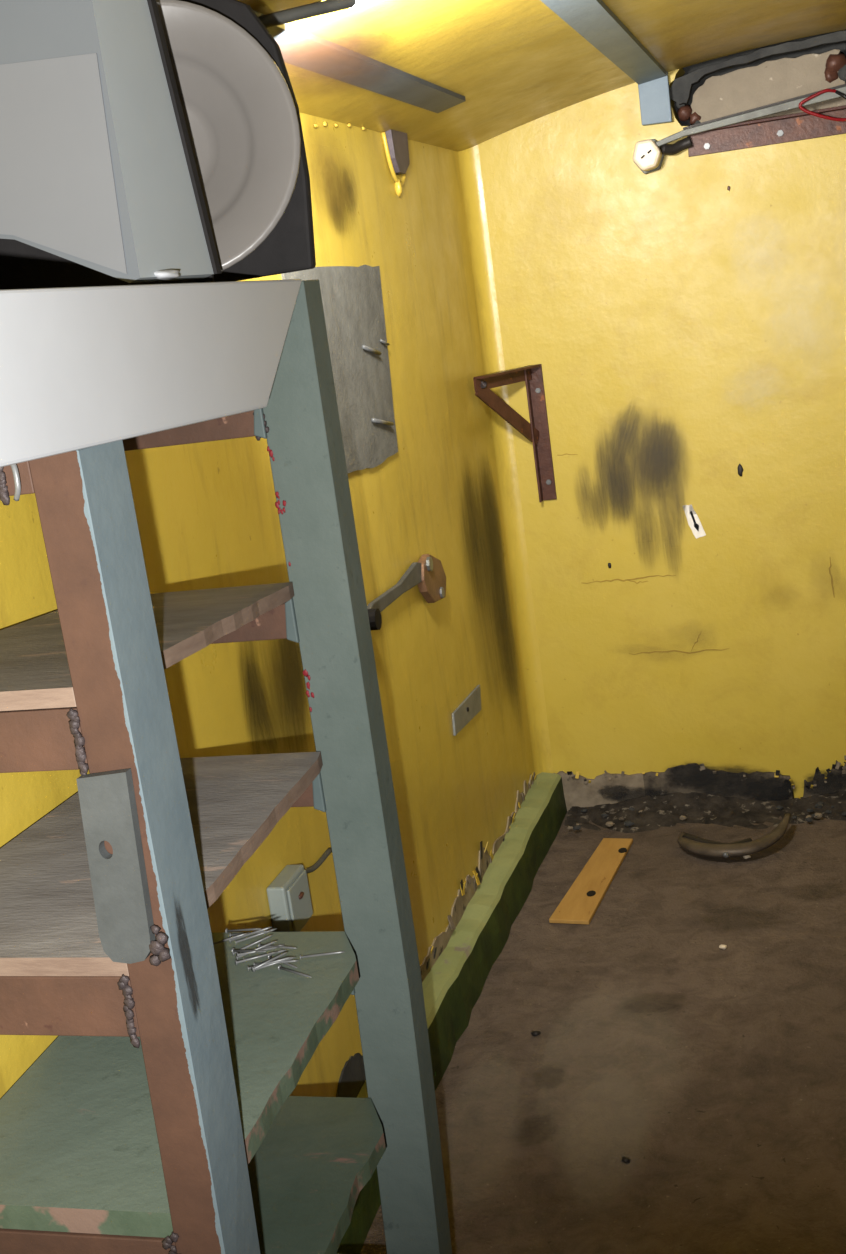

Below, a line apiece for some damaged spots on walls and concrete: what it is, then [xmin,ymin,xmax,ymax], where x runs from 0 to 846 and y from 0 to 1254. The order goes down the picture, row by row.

damp [468,497,515,675]
peeling [554,756,846,833]